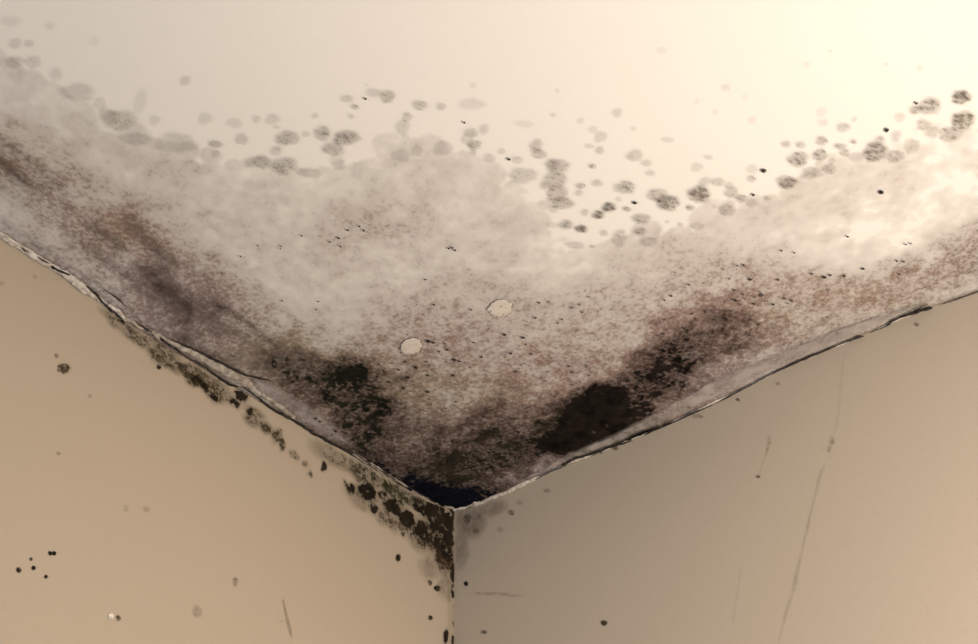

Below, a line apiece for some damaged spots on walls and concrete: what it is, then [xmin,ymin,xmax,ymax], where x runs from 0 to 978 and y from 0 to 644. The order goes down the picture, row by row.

water stain [944,92,974,139]
spalling [487,300,512,317]
spalling [401,338,422,354]
water stain [0,126,978,607]